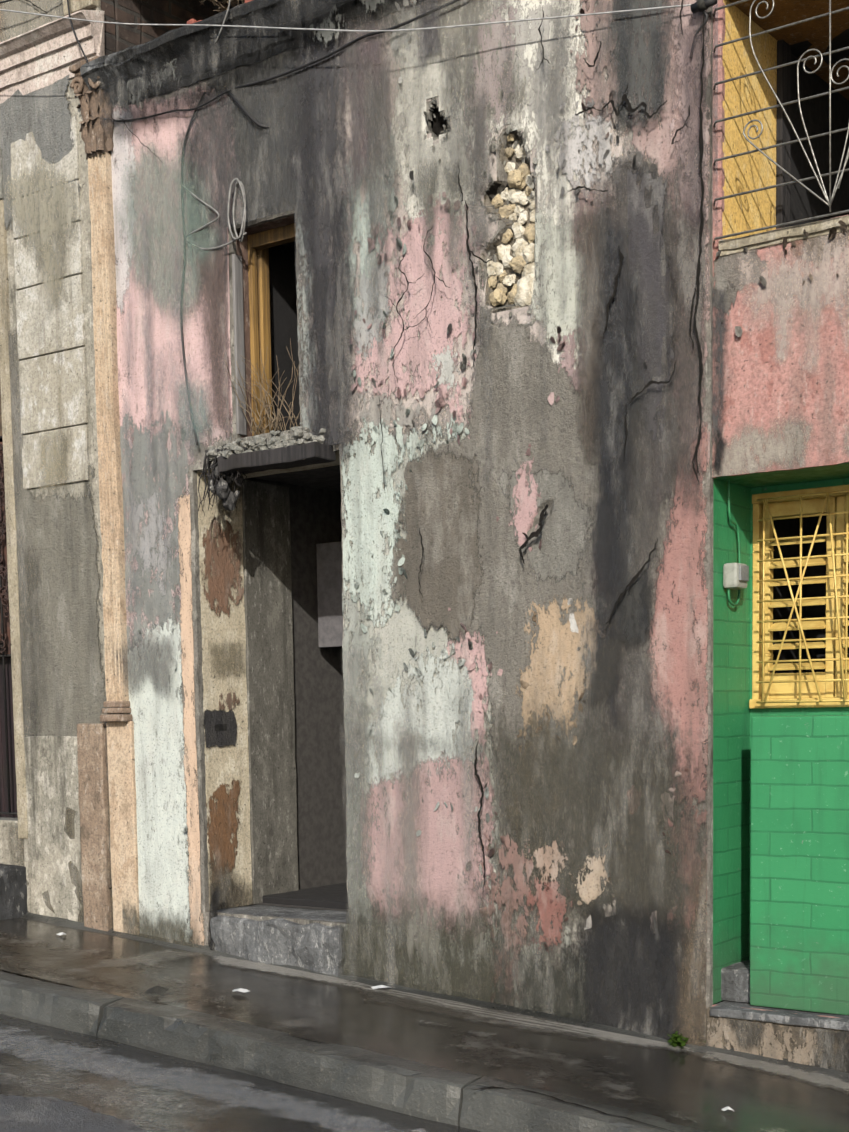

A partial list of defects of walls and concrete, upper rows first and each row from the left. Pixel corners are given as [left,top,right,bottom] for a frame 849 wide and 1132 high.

crack [536,8,550,70]
crack [569,185,608,193]
crack [575,0,705,485]
crack [379,167,496,490]
rust [200,516,244,617]
flaking render [341,0,667,1003]
crack [519,505,548,564]
leakage [341,0,727,1047]
crack [606,538,658,624]
rust [206,778,242,884]